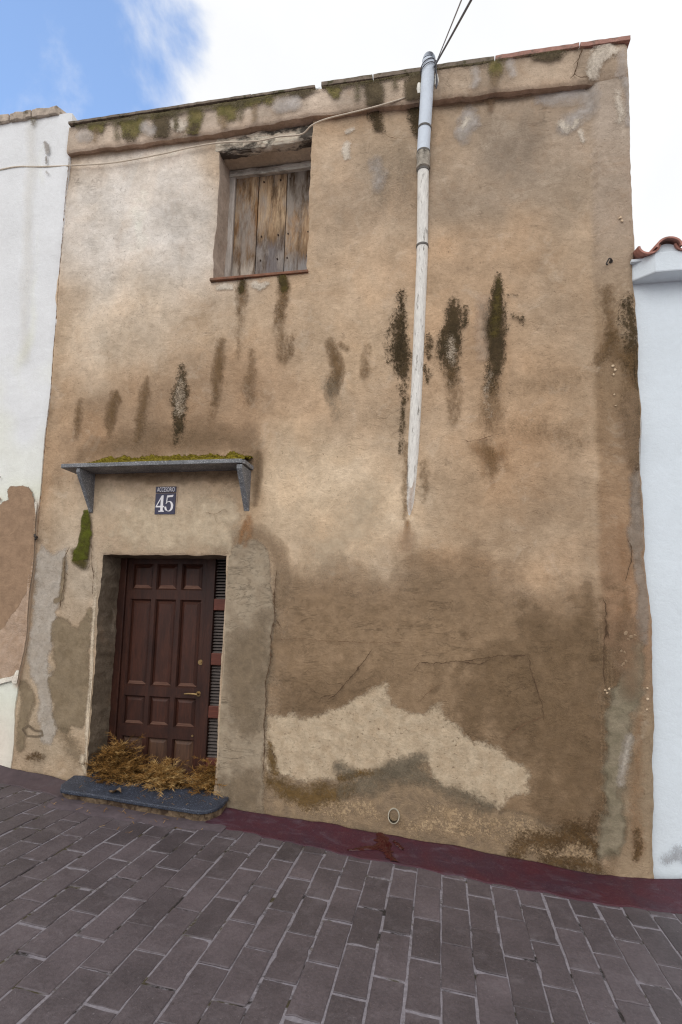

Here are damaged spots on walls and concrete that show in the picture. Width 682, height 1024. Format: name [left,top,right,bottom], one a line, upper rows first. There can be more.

water stain [75,71,422,151]
water stain [105,363,227,449]
water stain [236,280,247,316]
water stain [326,341,348,404]
water stain [384,290,470,531]
mould [482,272,525,428]
water stain [595,285,641,470]
flaking render [0,476,68,745]
flaking render [80,561,97,774]
water stain [214,529,617,872]
flaking render [262,683,602,875]
crack [416,654,544,720]